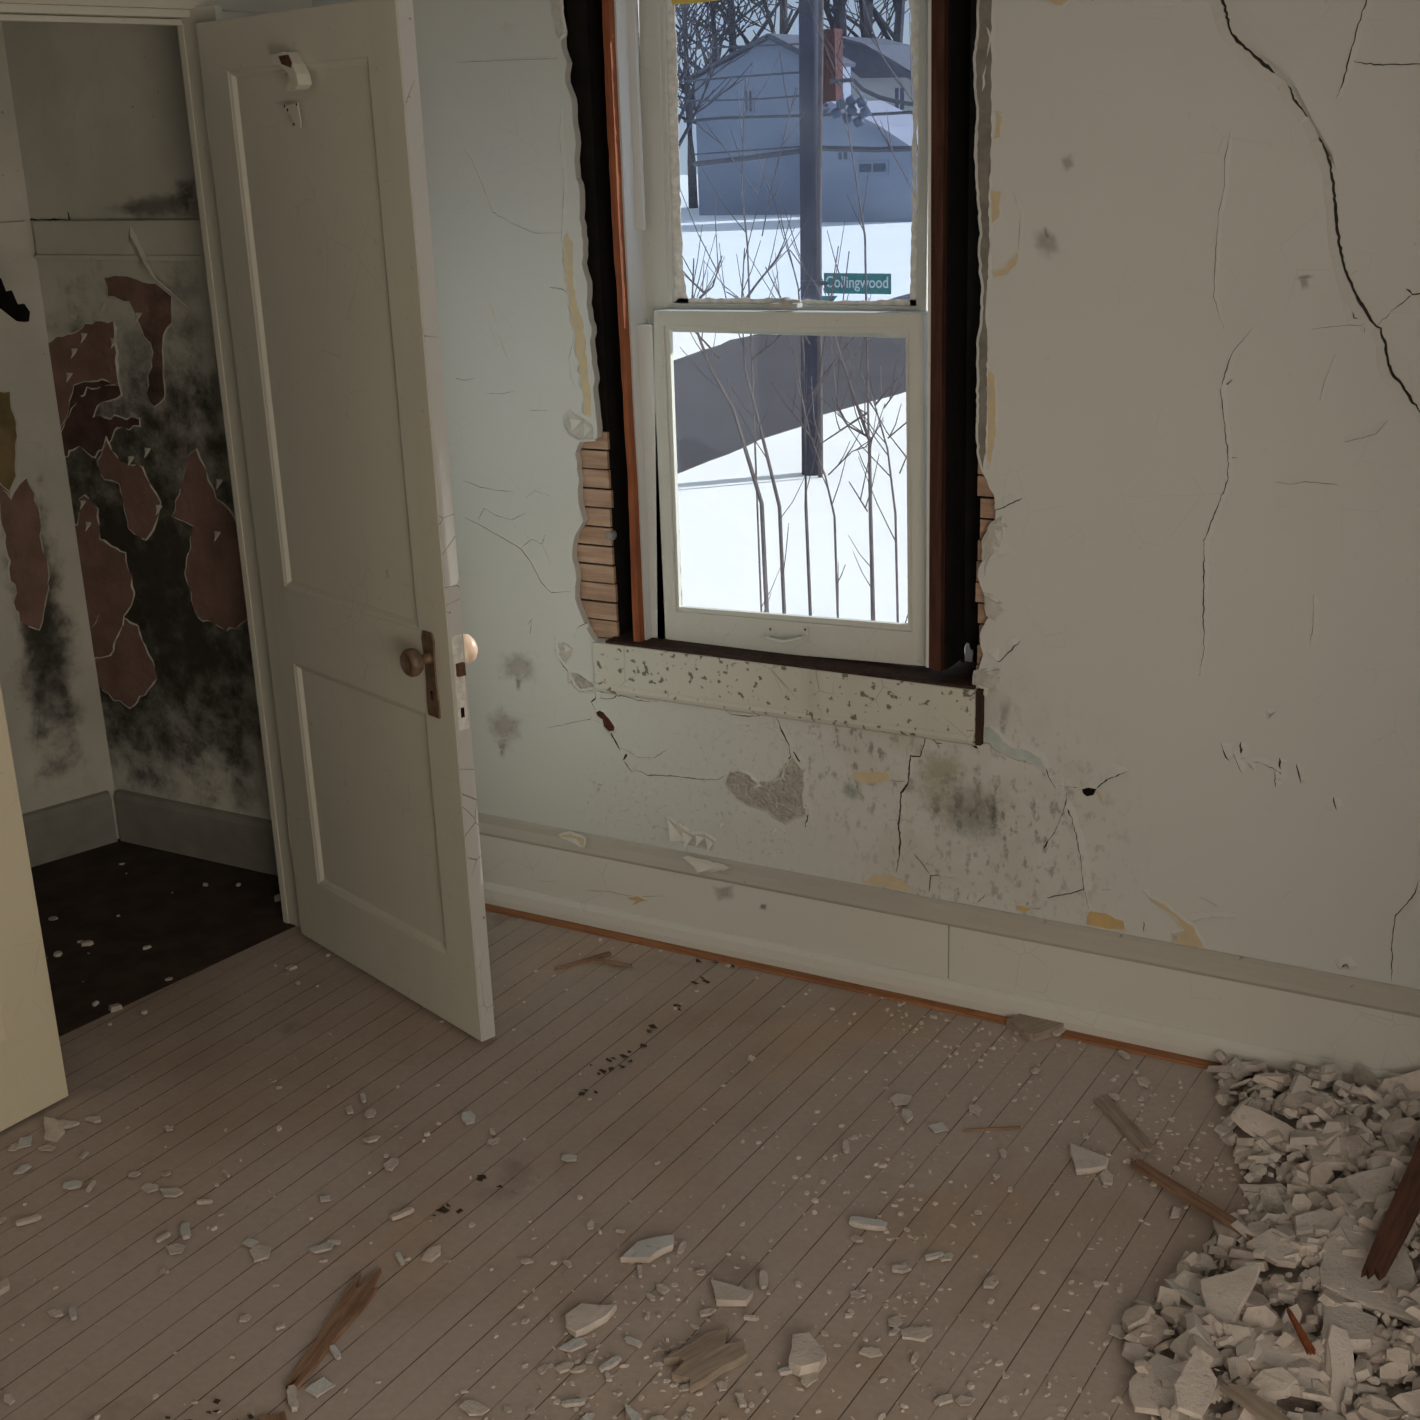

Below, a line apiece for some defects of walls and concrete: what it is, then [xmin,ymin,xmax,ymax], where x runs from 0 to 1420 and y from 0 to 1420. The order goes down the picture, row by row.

spalling [973,0,1021,471]
crack [1077,0,1420,442]
peeling [0,389,51,631]
leakage [23,575,73,718]
peeling [48,273,174,432]
peeling [74,494,157,709]
leakage [61,372,262,769]
peeling [97,436,247,631]
crack [1199,132,1255,677]
crack [891,739,956,892]
crack [993,726,1128,910]
crack [1391,881,1420,983]